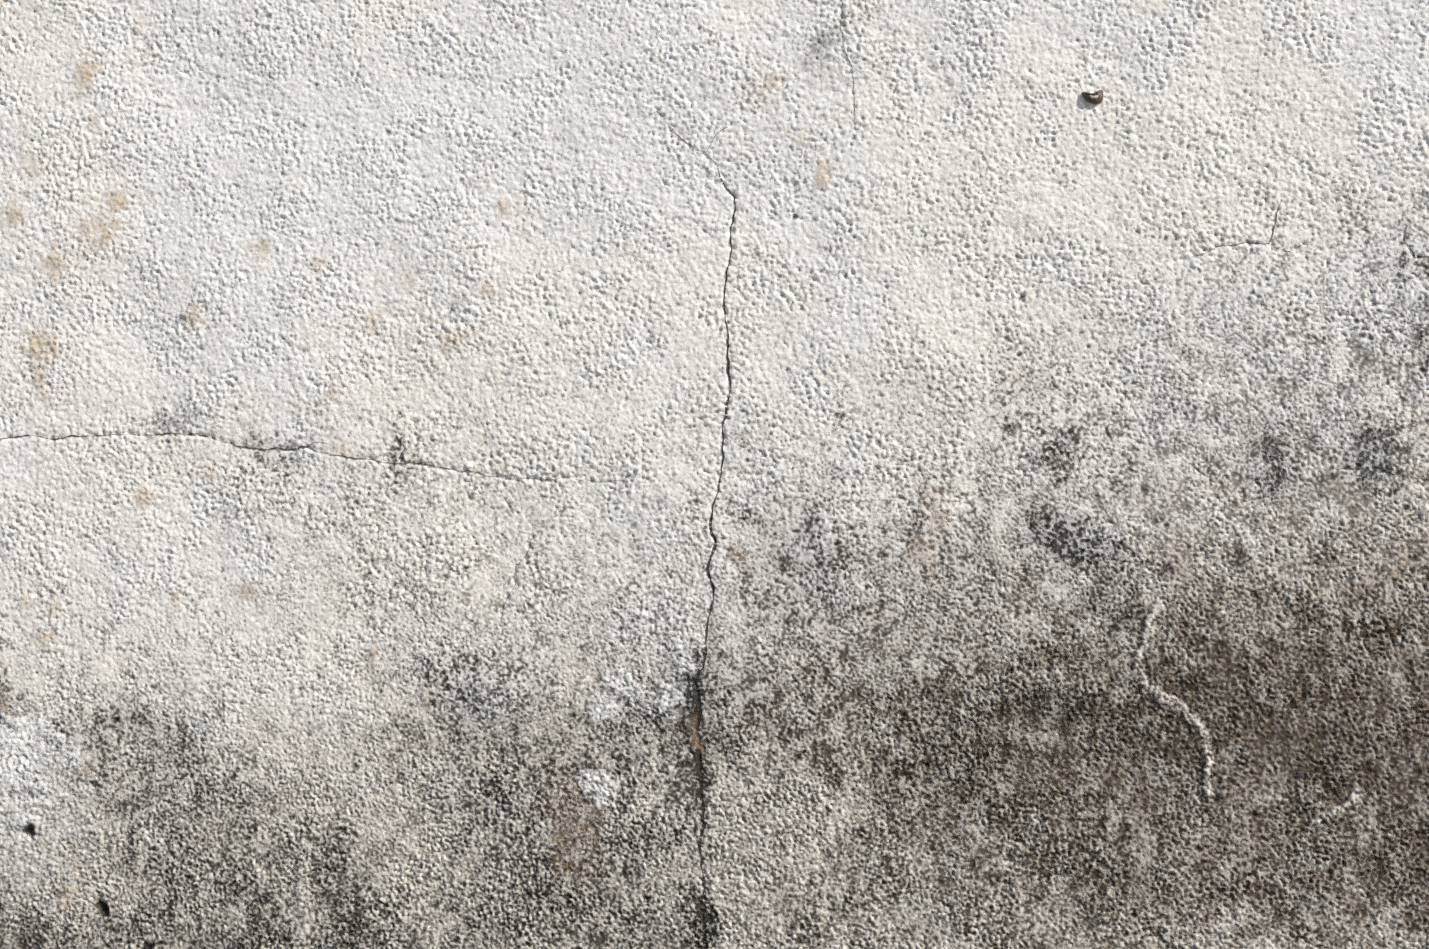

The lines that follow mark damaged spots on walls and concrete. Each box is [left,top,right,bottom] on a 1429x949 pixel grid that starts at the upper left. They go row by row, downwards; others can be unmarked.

crack [1,433,616,482]
damp [1003,376,1100,483]
damp [1251,418,1297,504]
damp [1330,416,1414,495]
crack [643,111,736,949]
damp [0,499,1429,949]